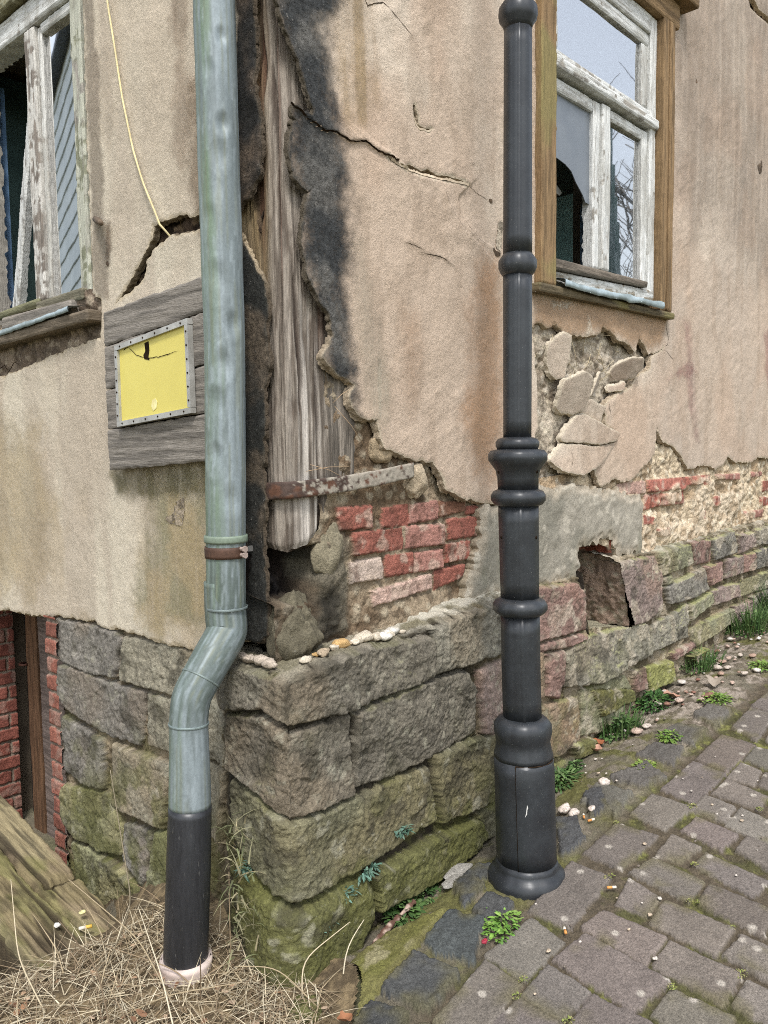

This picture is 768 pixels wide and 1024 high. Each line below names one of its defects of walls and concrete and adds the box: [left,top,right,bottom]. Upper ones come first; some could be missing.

crack [96,214,200,303]
leakage [236,0,262,203]
crack [256,211,264,234]
leakage [279,0,357,401]
leakage [354,0,366,121]
flaking render [241,0,495,663]
crack [291,102,487,243]
flaking render [532,323,768,553]